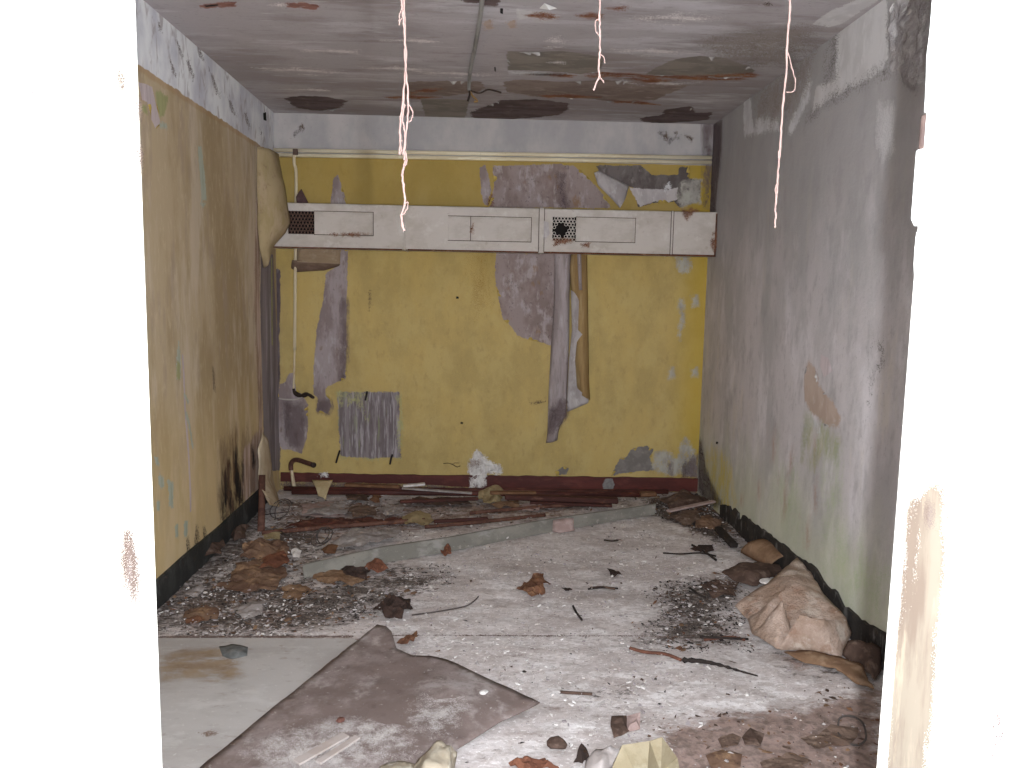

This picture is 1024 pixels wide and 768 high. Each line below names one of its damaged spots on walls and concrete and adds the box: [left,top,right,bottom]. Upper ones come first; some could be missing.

rust [529,71,760,86]
damp [602,11,831,138]
peeling [479,163,703,209]
peeling [254,147,404,471]
peeling [495,253,571,443]
peeling [800,355,844,475]
damp [216,421,264,521]
spalling [467,449,503,488]
spalling [602,446,653,489]